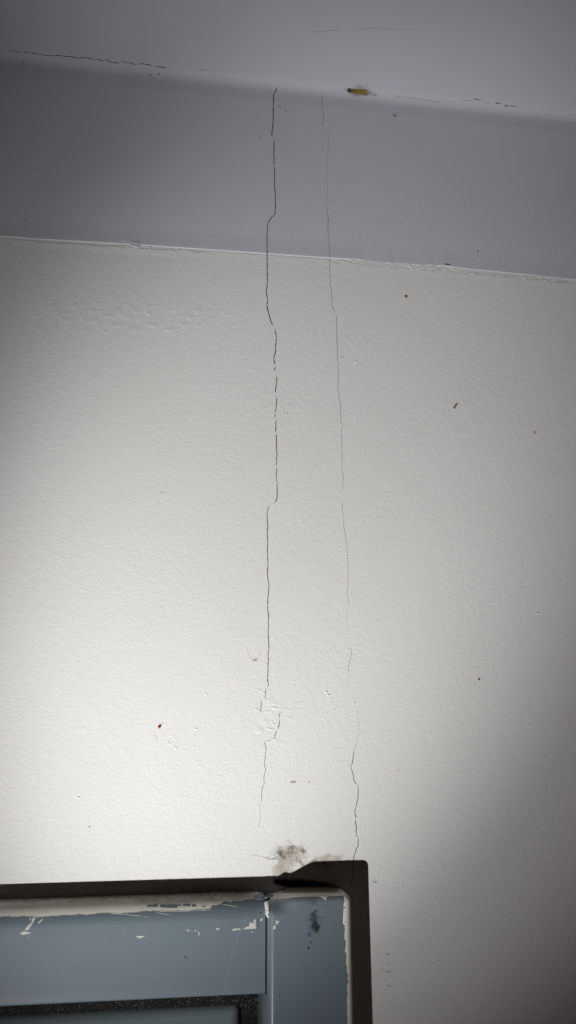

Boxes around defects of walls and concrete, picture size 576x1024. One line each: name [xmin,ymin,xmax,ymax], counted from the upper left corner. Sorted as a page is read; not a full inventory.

crack [8,50,165,68]
crack [260,88,280,801]
crack [350,743,359,888]
peeling [216,918,279,932]